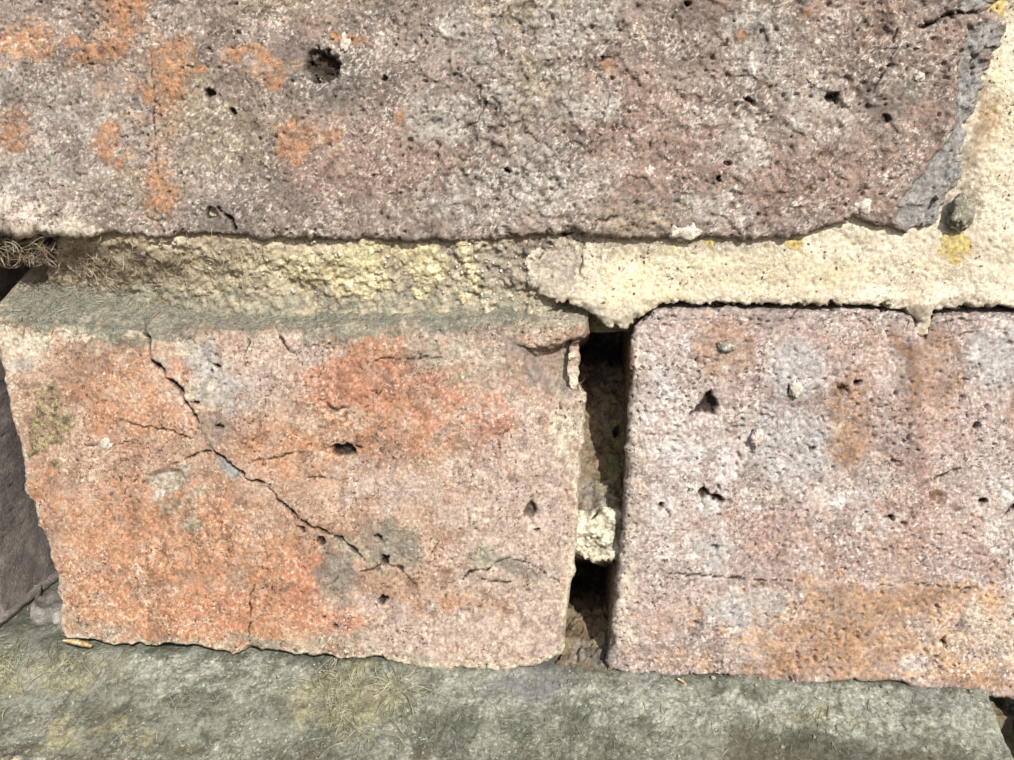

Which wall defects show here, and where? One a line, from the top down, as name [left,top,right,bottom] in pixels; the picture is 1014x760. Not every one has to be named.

crack [89,334,417,586]